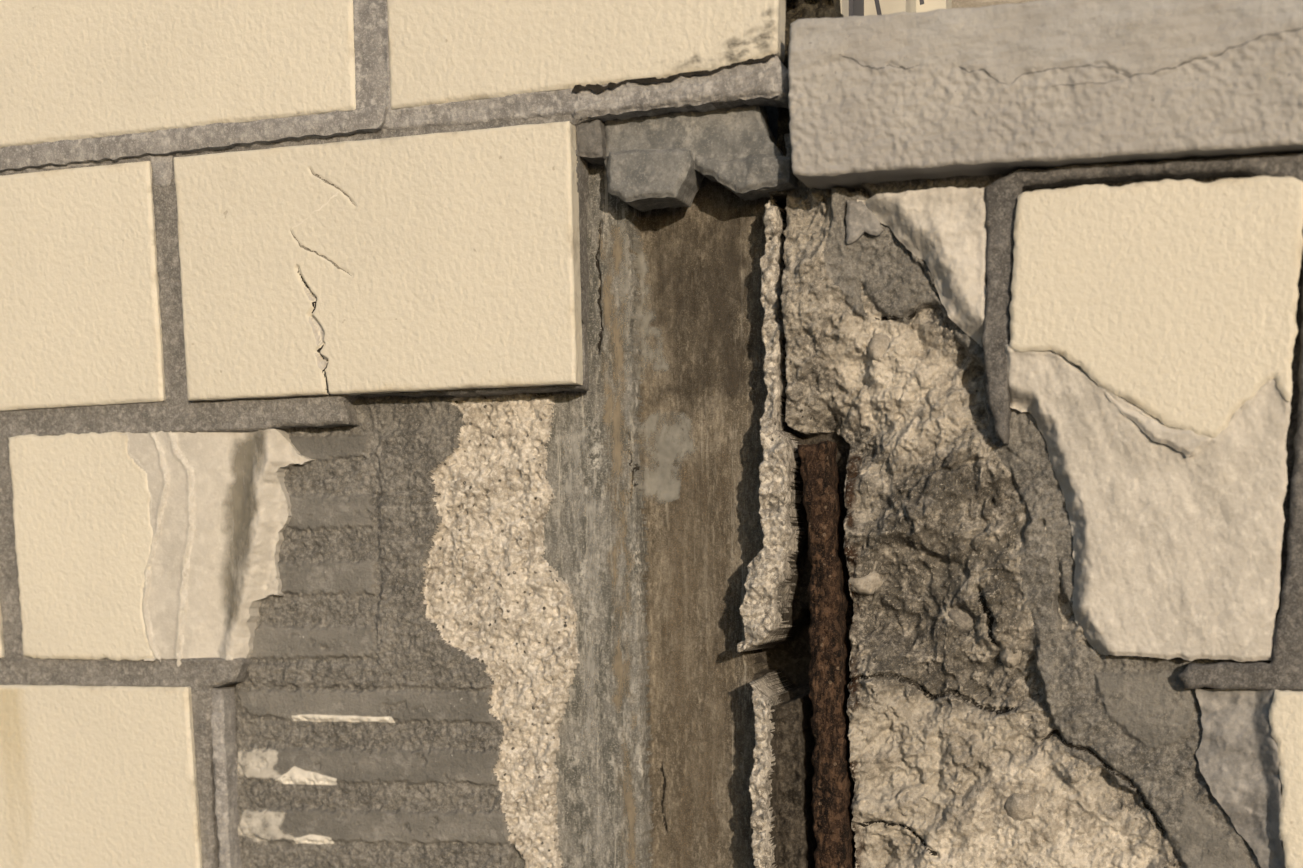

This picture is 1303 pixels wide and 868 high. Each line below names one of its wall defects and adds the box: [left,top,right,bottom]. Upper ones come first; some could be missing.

spalling [783,0,843,69]
crack [291,169,355,396]
rust [844,456,861,565]
spalling [767,107,1182,868]
spalling [1005,344,1291,662]
spalling [420,393,580,868]
spalling [1195,688,1286,868]